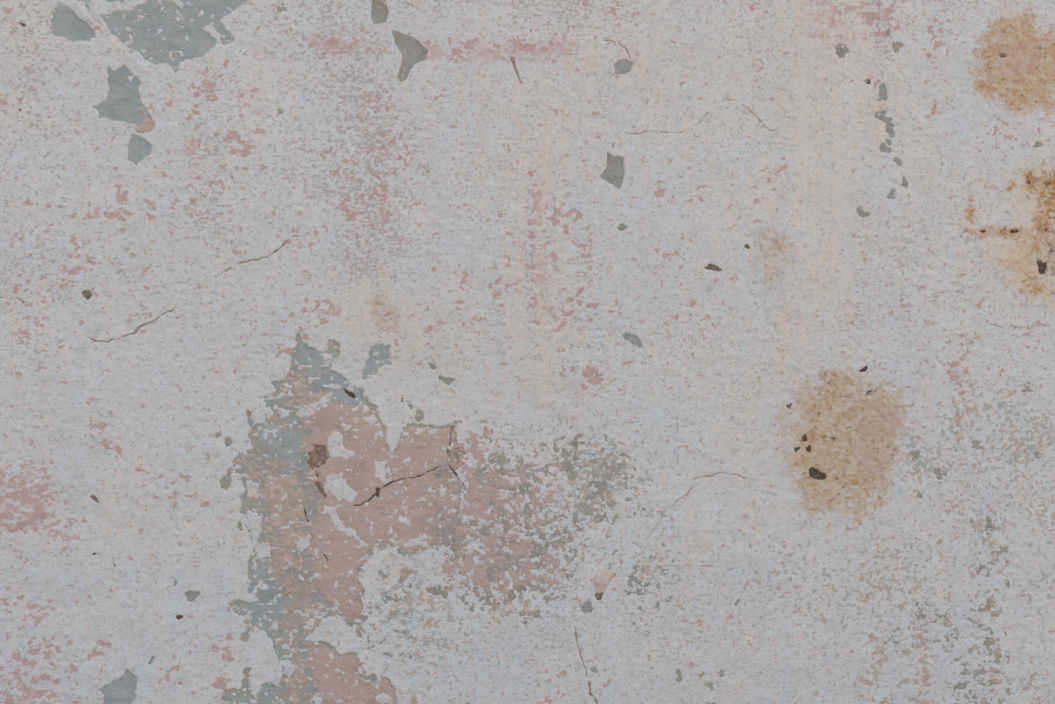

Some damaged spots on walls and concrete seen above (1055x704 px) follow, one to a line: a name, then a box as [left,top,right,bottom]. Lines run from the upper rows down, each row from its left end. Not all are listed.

peeling [51,0,247,101]
peeling [371,0,428,81]
peeling [93,66,156,165]
peeling [600,142,624,189]
crack [215,235,295,278]
rust [959,139,1055,321]
crack [87,306,177,343]
crack [353,425,466,506]
crack [646,391,758,541]
peeling [215,332,687,704]
peeling [0,662,81,704]
peeling [99,670,137,704]